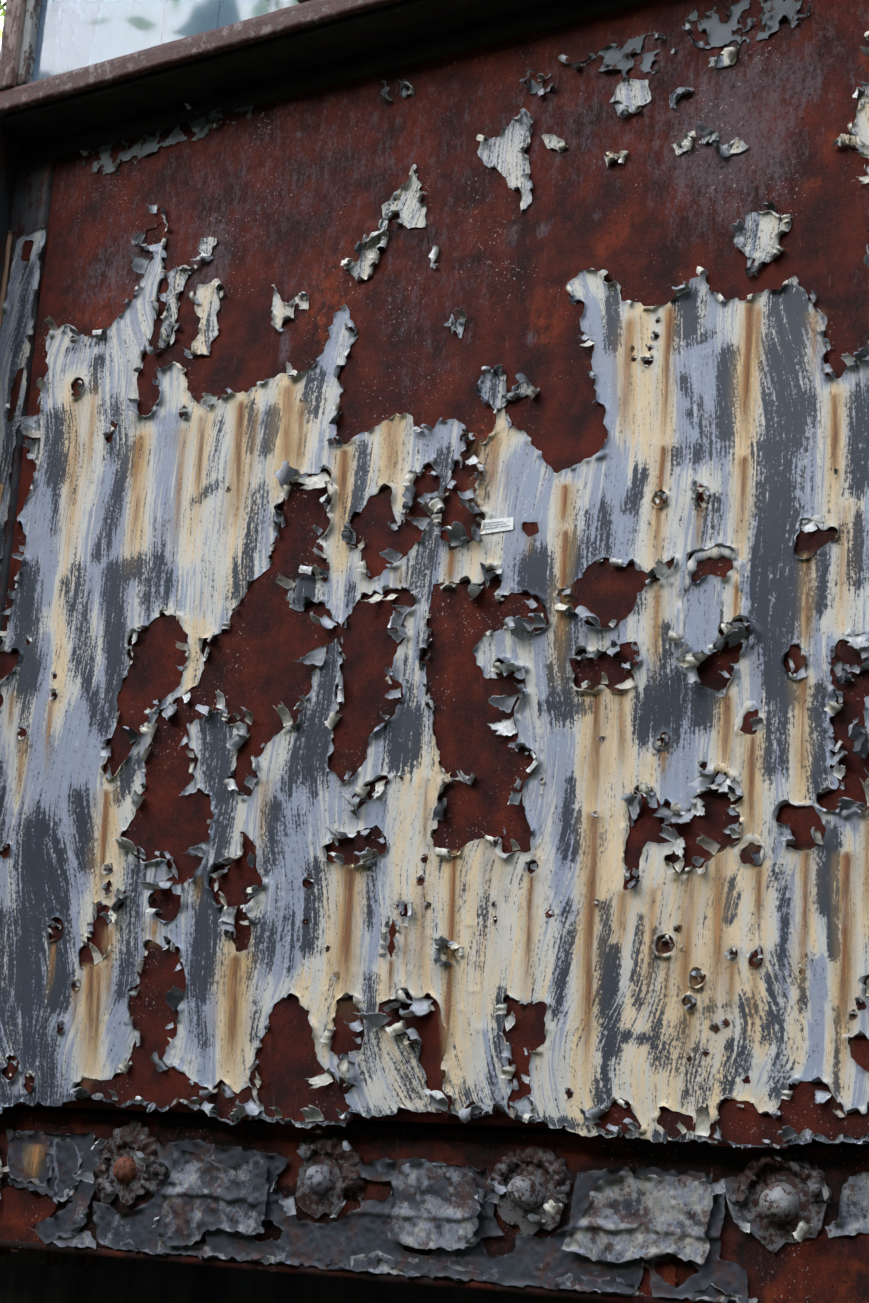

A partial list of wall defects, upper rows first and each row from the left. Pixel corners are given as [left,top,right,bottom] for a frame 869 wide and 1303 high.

rust [71,377,84,398]
rust [102,418,118,443]
rust [226,404,245,498]
peeling [0,0,869,952]
rust [626,310,672,397]
rust [740,308,759,408]
peeling [79,887,127,968]
rust [302,874,314,889]
rust [524,859,539,932]
peeling [0,939,869,1303]